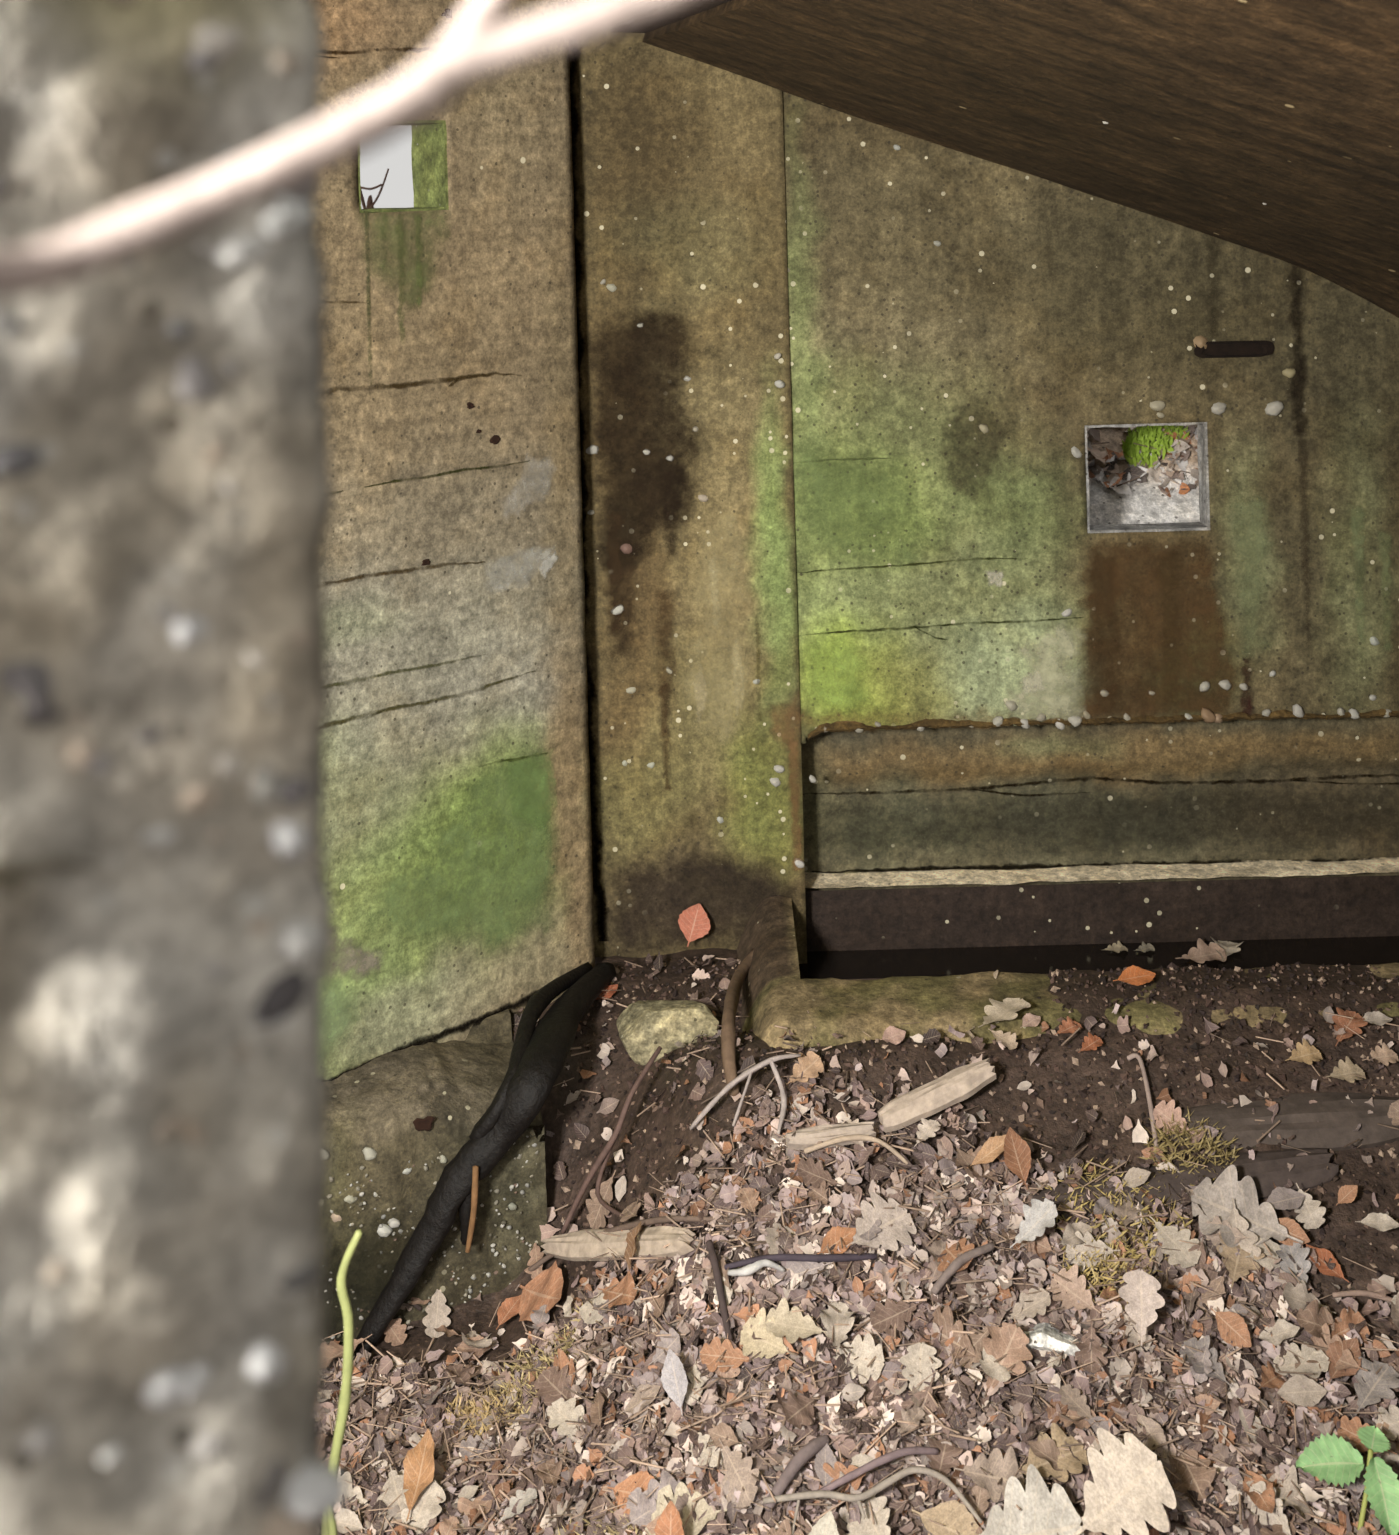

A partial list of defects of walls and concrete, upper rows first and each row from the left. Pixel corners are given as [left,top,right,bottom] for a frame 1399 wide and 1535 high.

spalling [622,0,732,33]
crack [322,50,357,58]
crack [395,46,431,54]
crack [325,372,511,395]
crack [336,460,530,493]
crack [570,47,608,941]
water stain [593,315,697,651]
crack [336,561,485,583]
crack [326,656,535,727]
water stain [660,623,674,789]
crack [805,774,1399,796]
water stain [621,861,775,950]